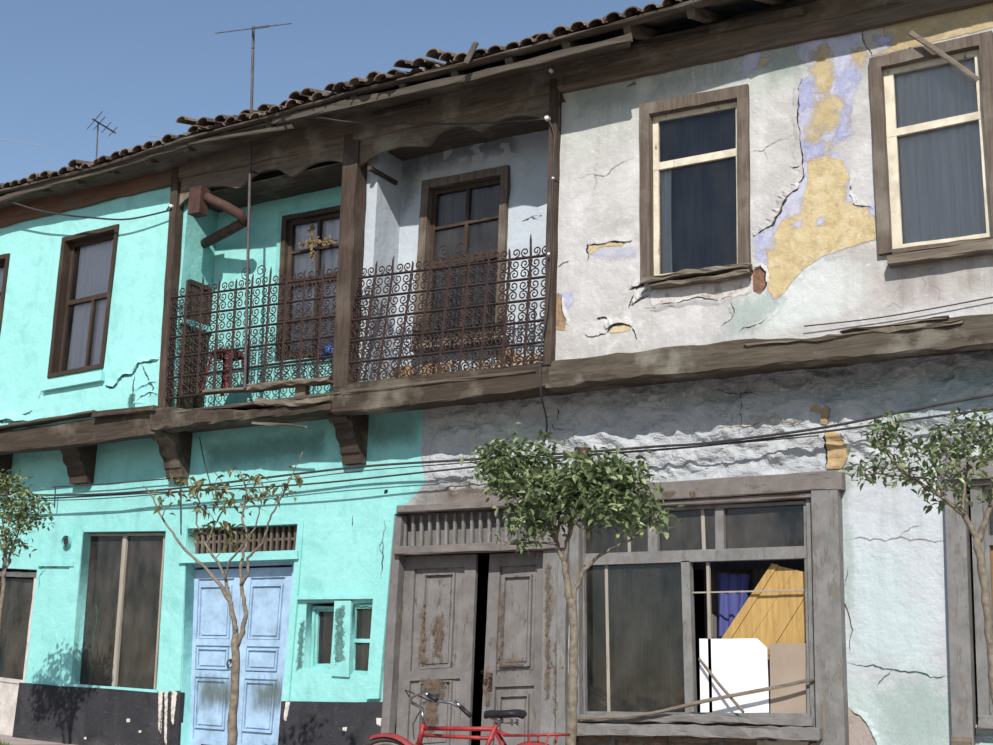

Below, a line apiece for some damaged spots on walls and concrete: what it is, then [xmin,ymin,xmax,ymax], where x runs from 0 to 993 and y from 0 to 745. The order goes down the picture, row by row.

peeling [641,2,993,333]
peeling [586,234,635,261]
peeling [585,317,637,338]
crack [105,352,159,407]
crack [0,391,45,424]
peeling [810,403,854,469]
crack [848,662,948,684]
peeling [158,691,177,744]
spalling [848,706,882,745]